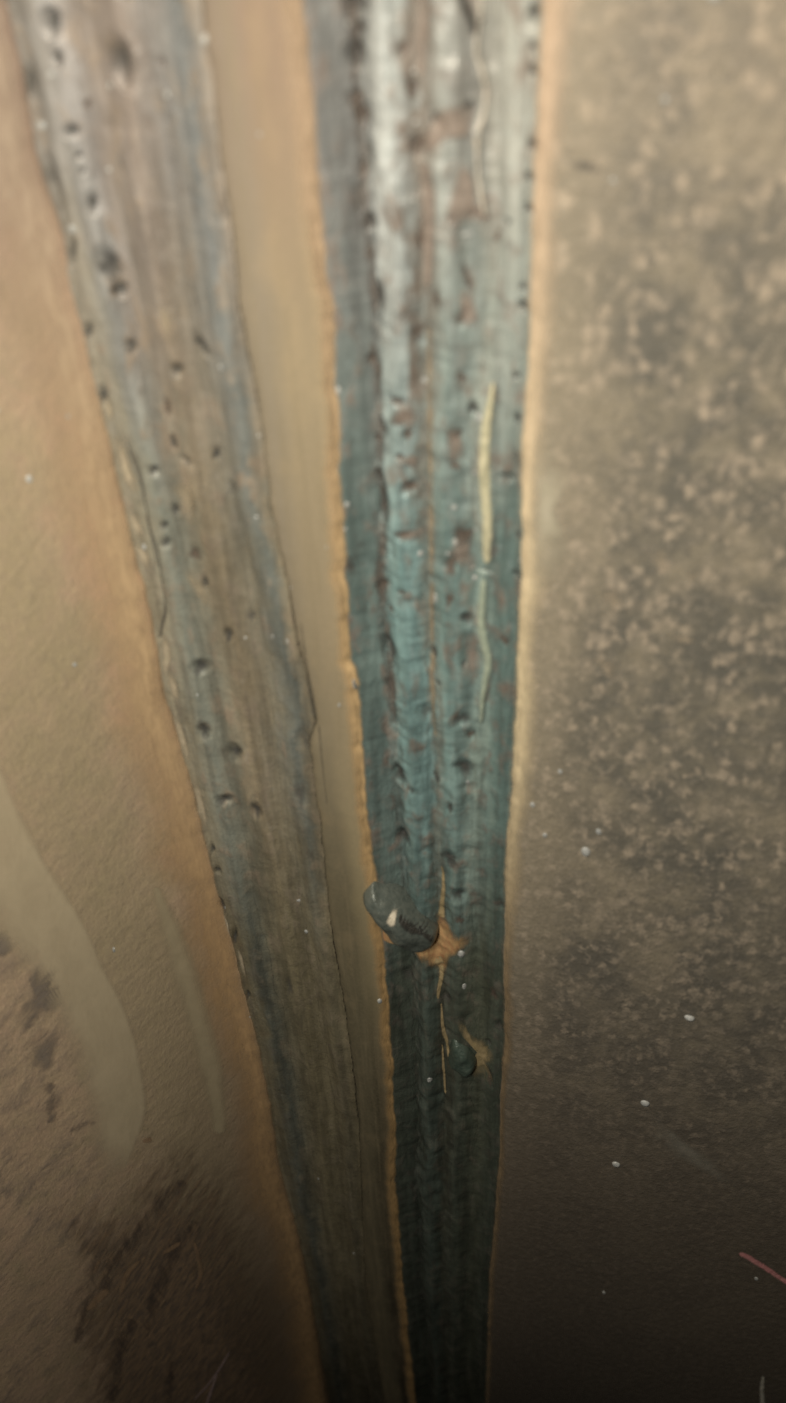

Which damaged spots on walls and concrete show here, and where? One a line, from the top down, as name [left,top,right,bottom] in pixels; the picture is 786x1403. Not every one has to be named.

corrosion [416,866,489,1093]